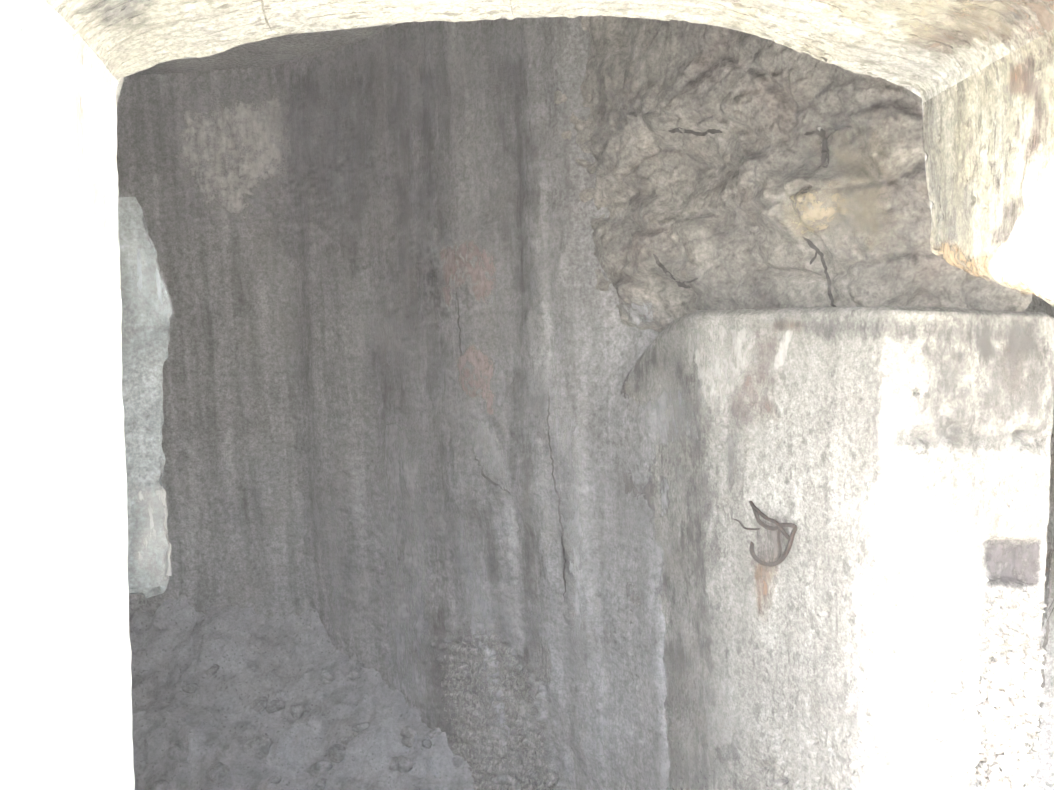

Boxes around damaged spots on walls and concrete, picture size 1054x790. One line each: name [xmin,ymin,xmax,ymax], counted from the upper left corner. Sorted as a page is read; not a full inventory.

leakage [497,59,543,295]
crack [455,292,463,357]
leakage [379,424,455,741]
leakage [456,509,511,741]
crack [547,389,566,602]
leakage [554,410,584,678]
rust [755,519,786,613]